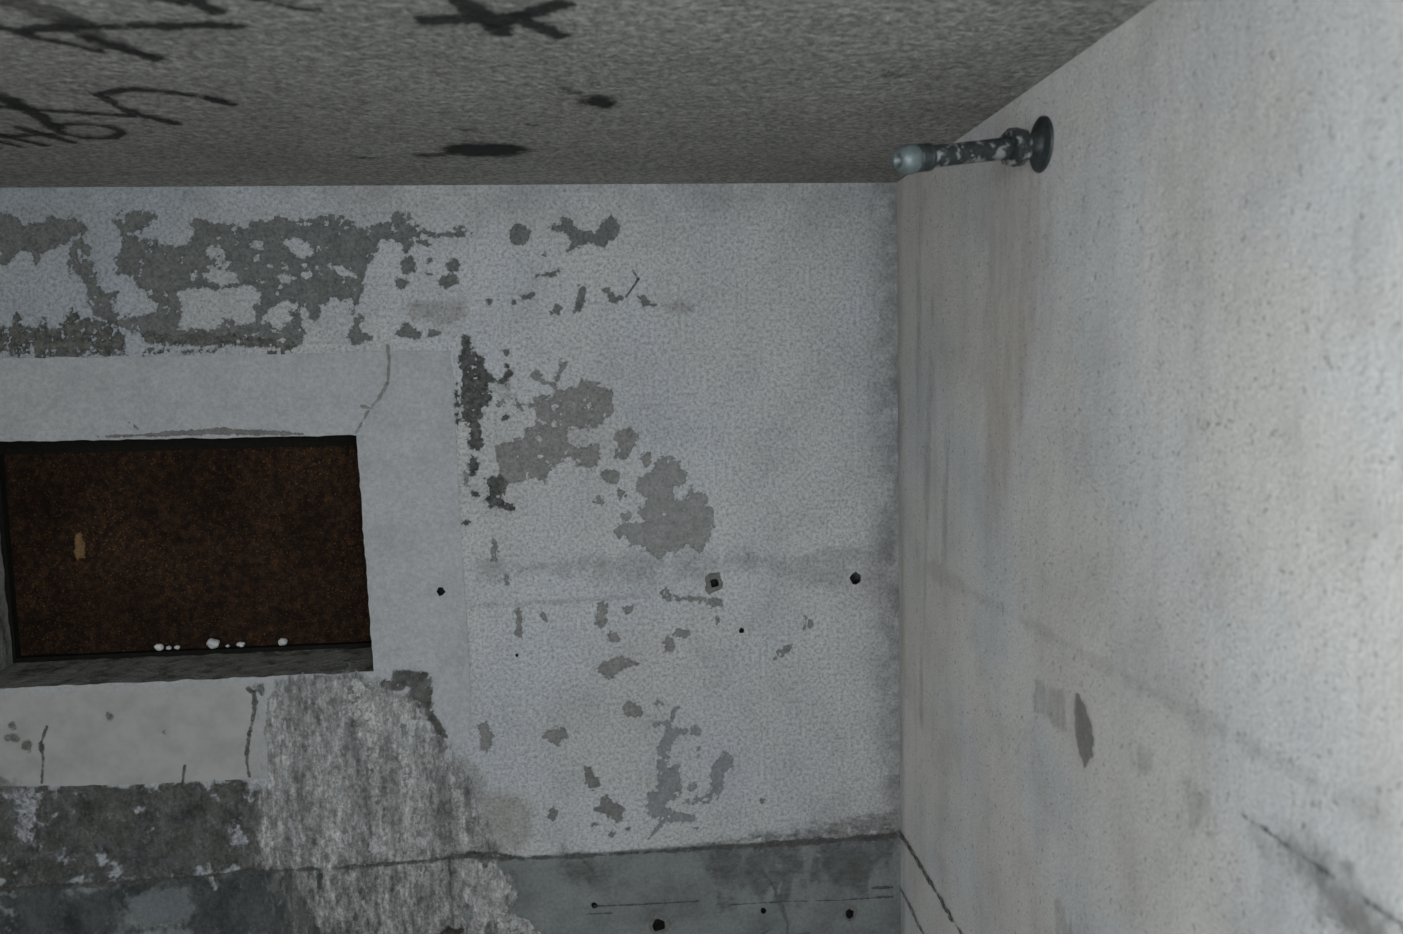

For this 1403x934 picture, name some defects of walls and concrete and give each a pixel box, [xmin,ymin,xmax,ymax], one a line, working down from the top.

peeling [509,223,531,246]
peeling [551,215,620,253]
peeling [0,208,472,358]
peeling [512,252,560,305]
peeling [550,285,586,315]
peeling [603,287,657,308]